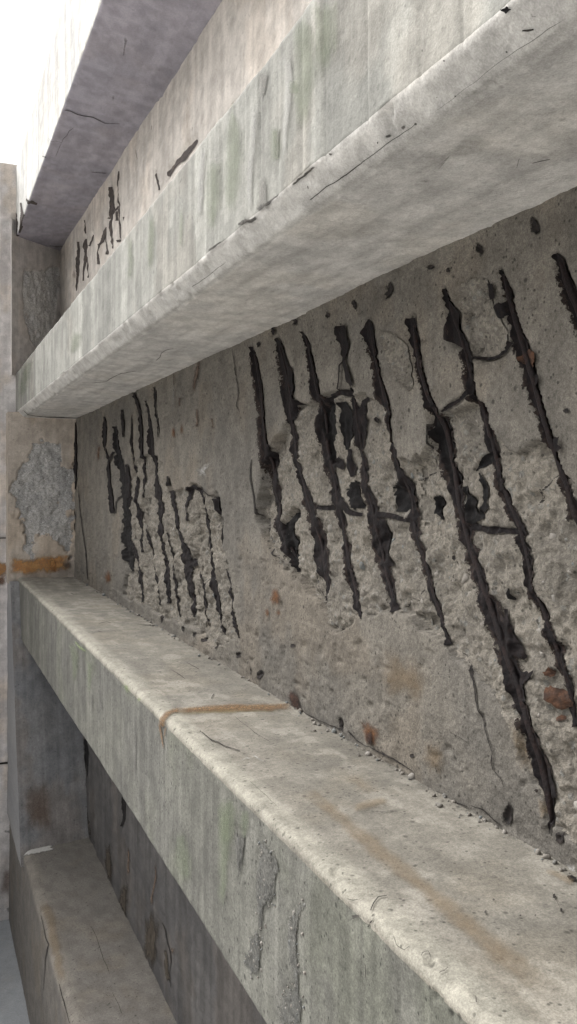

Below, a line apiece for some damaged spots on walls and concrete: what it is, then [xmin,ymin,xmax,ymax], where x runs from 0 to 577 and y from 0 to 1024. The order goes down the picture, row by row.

crack [439,22,560,109]
spalling [155,139,198,190]
crack [310,125,414,200]
spalling [75,171,124,291]
spalling [459,278,508,362]
rust [0,556,70,584]
spalling [121,455,235,649]
rust [404,270,577,833]
spalling [261,393,577,843]
rust [159,691,300,746]
crack [452,653,504,787]
crack [456,803,501,825]